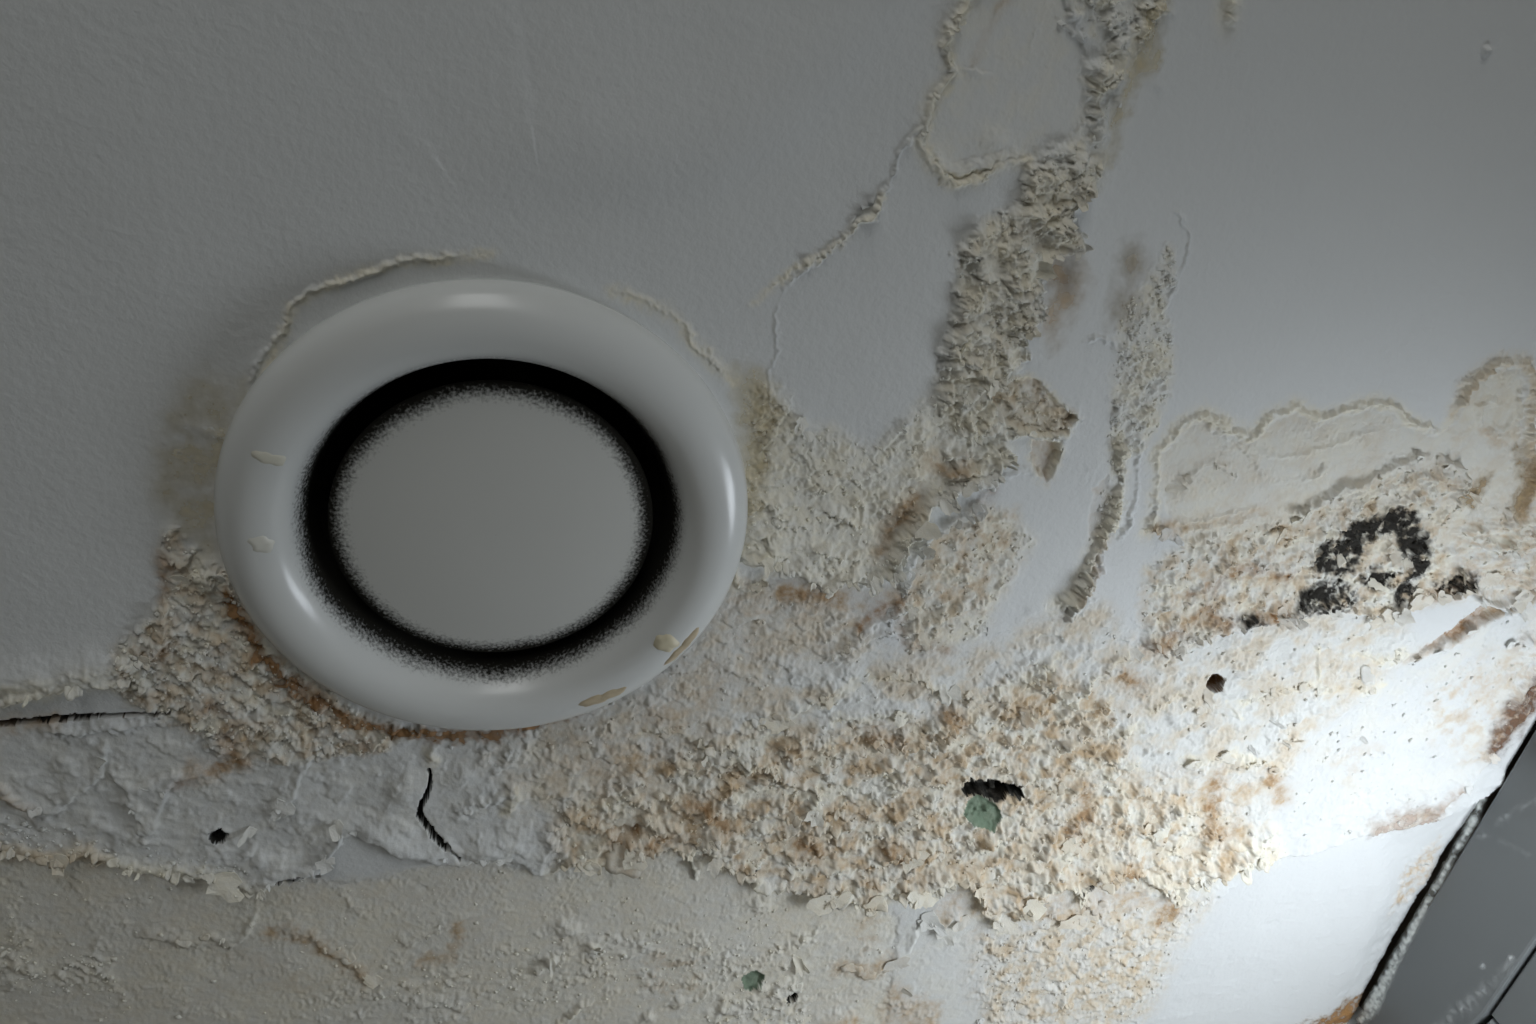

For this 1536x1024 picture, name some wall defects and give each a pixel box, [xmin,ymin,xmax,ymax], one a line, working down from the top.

crack [747,114,933,414]
damp [1461,478,1487,508]
damp [1514,446,1536,515]
peeling [507,202,1536,923]
damp [1298,506,1477,619]
spalling [112,529,429,767]
damp [1240,615,1261,630]
crack [0,711,171,728]
spalling [208,828,230,845]
crack [416,768,461,862]
peeling [0,855,1242,1024]
spalling [1357,786,1485,1024]